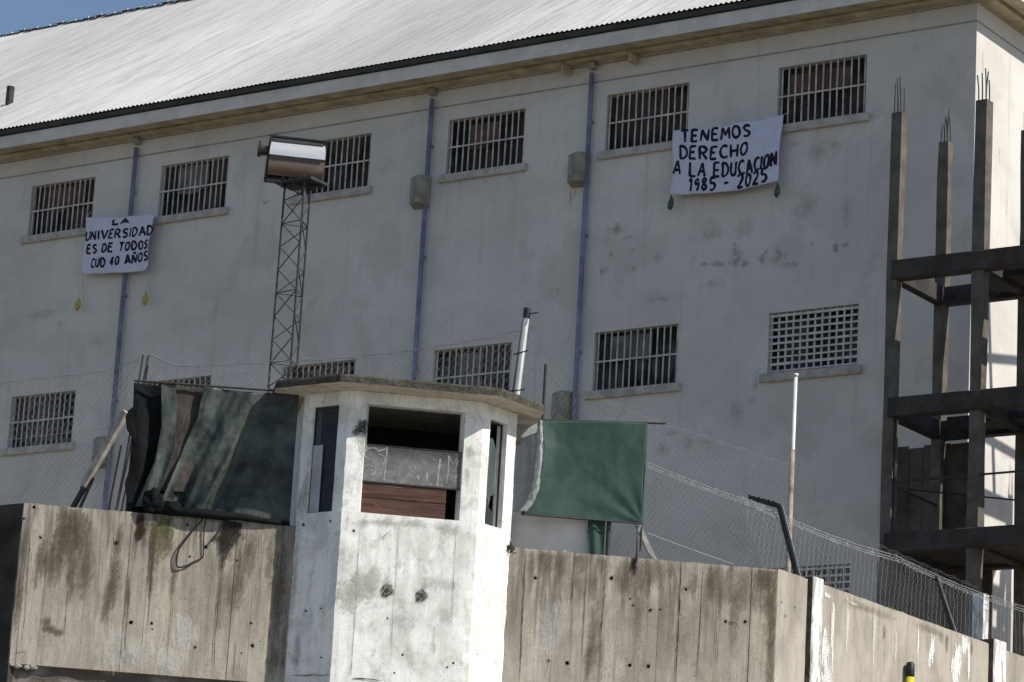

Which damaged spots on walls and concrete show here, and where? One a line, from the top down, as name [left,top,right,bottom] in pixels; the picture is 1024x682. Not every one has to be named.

water stain [36,510,94,597]
water stain [102,525,130,621]
water stain [142,524,178,598]
water stain [213,521,233,568]
water stain [762,573,777,675]
water stain [820,593,835,682]
water stain [917,627,973,682]